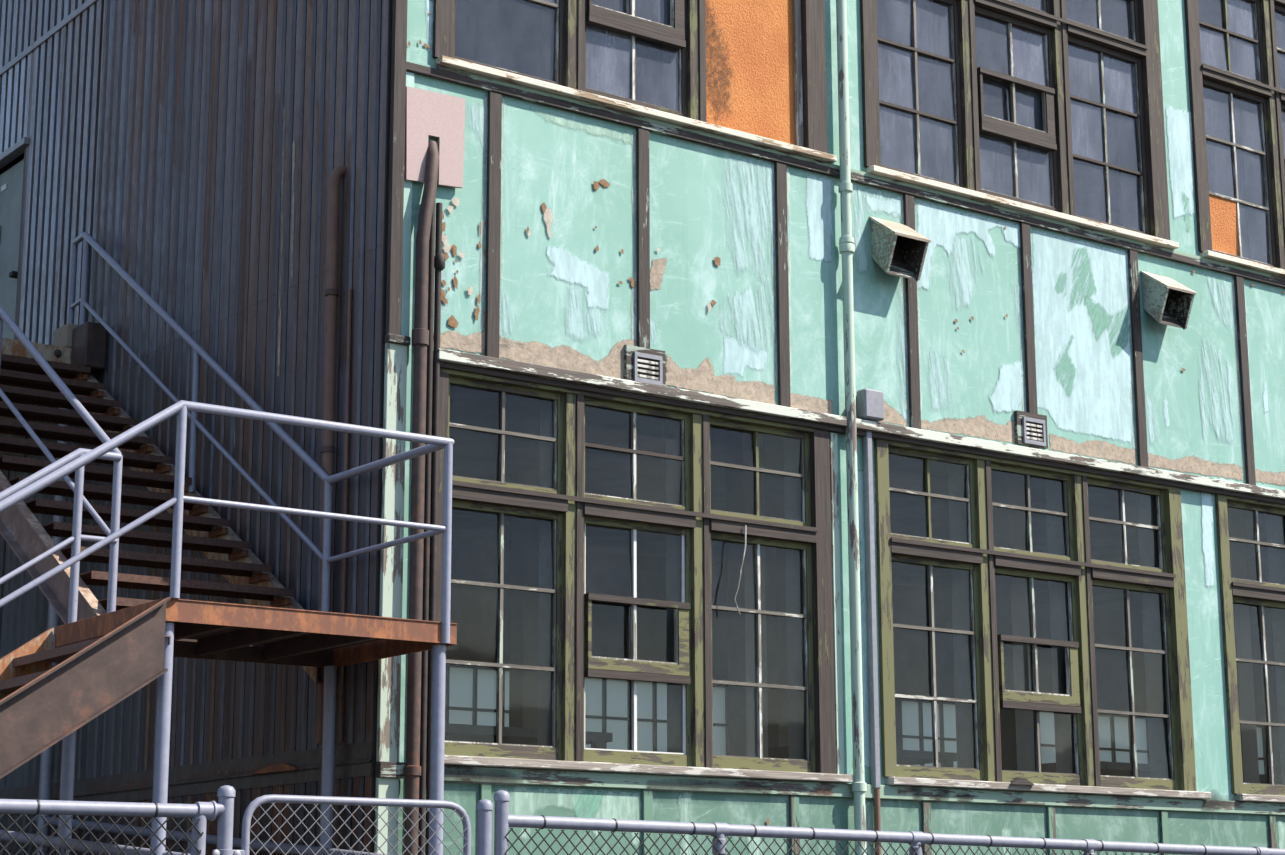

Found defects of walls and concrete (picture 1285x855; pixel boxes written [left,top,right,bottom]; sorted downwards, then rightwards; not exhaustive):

spalling [433,197,637,379]
spalling [665,354,833,414]
spalling [879,401,1015,444]
peeling [1206,794,1225,809]